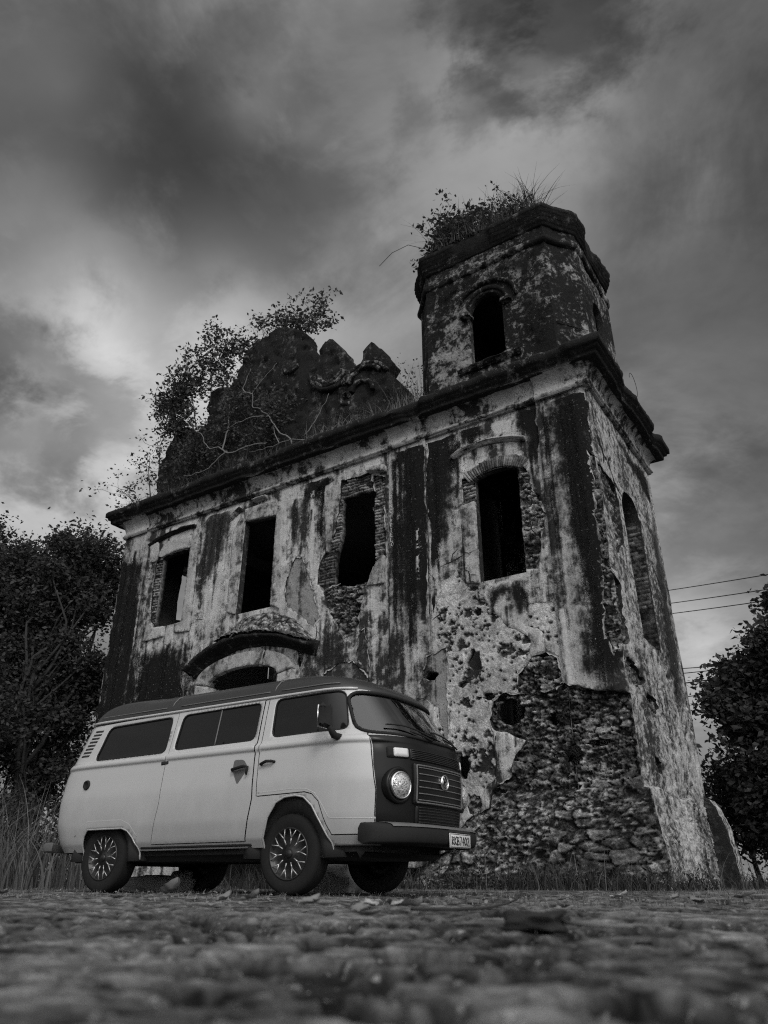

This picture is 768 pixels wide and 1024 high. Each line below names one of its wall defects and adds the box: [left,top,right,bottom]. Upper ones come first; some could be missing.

water stain [95,551,187,724]
water stain [199,511,231,629]
spalling [213,473,387,681]
water stain [392,392,623,684]
spalling [419,453,643,831]